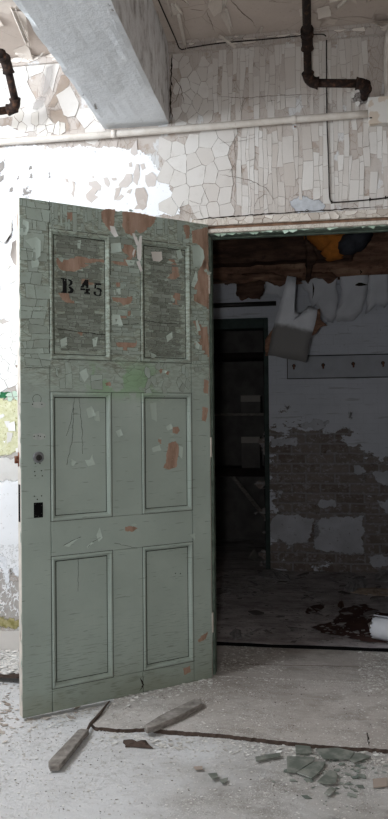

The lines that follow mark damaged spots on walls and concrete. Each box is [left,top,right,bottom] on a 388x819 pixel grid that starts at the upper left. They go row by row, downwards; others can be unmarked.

peeling [0,0,388,340]
crack [0,58,388,402]
peeling [193,319,209,361]
peeling [254,406,388,573]